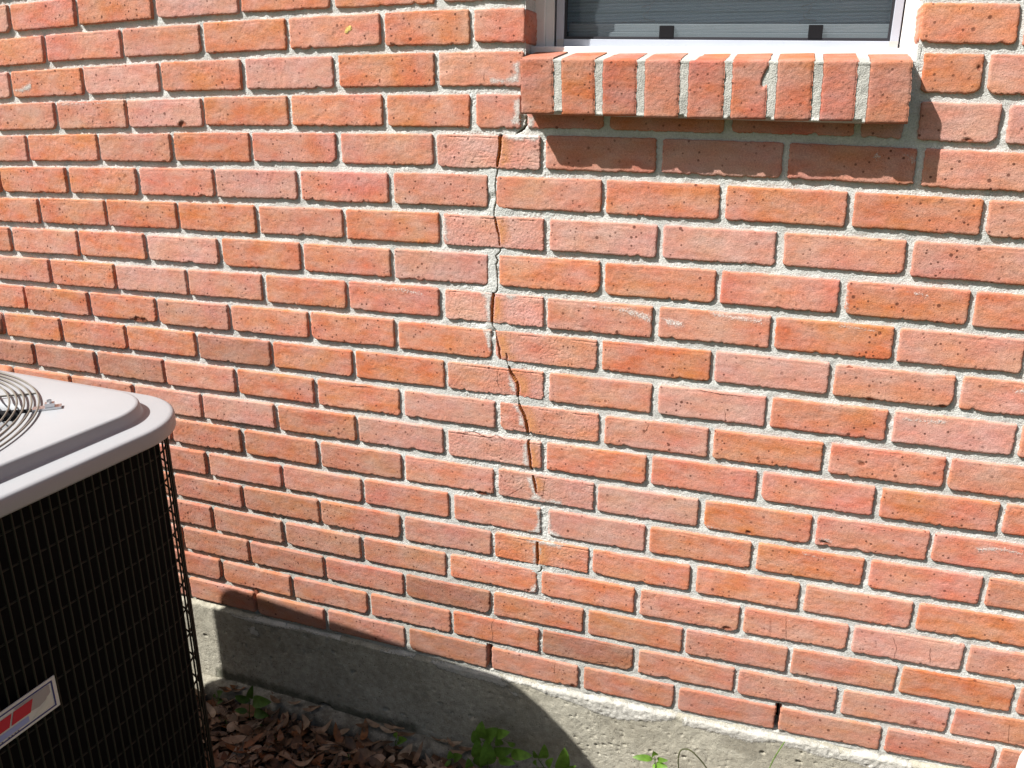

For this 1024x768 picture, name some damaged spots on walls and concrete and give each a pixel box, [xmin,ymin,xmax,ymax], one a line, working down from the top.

crack [458,137,545,495]
crack [536,542,544,573]